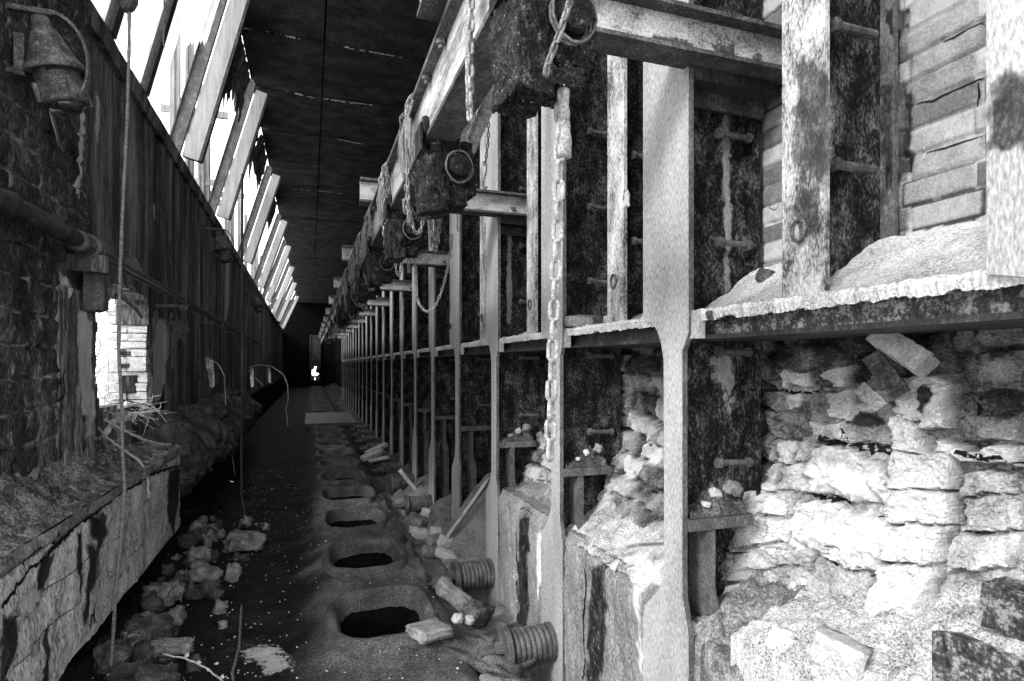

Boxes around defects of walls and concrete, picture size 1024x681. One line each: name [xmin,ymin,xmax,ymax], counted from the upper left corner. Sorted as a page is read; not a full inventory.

crack [916,78,984,107]
leakage [167,466,180,534]
leakage [77,512,116,629]
crack [580,568,588,679]